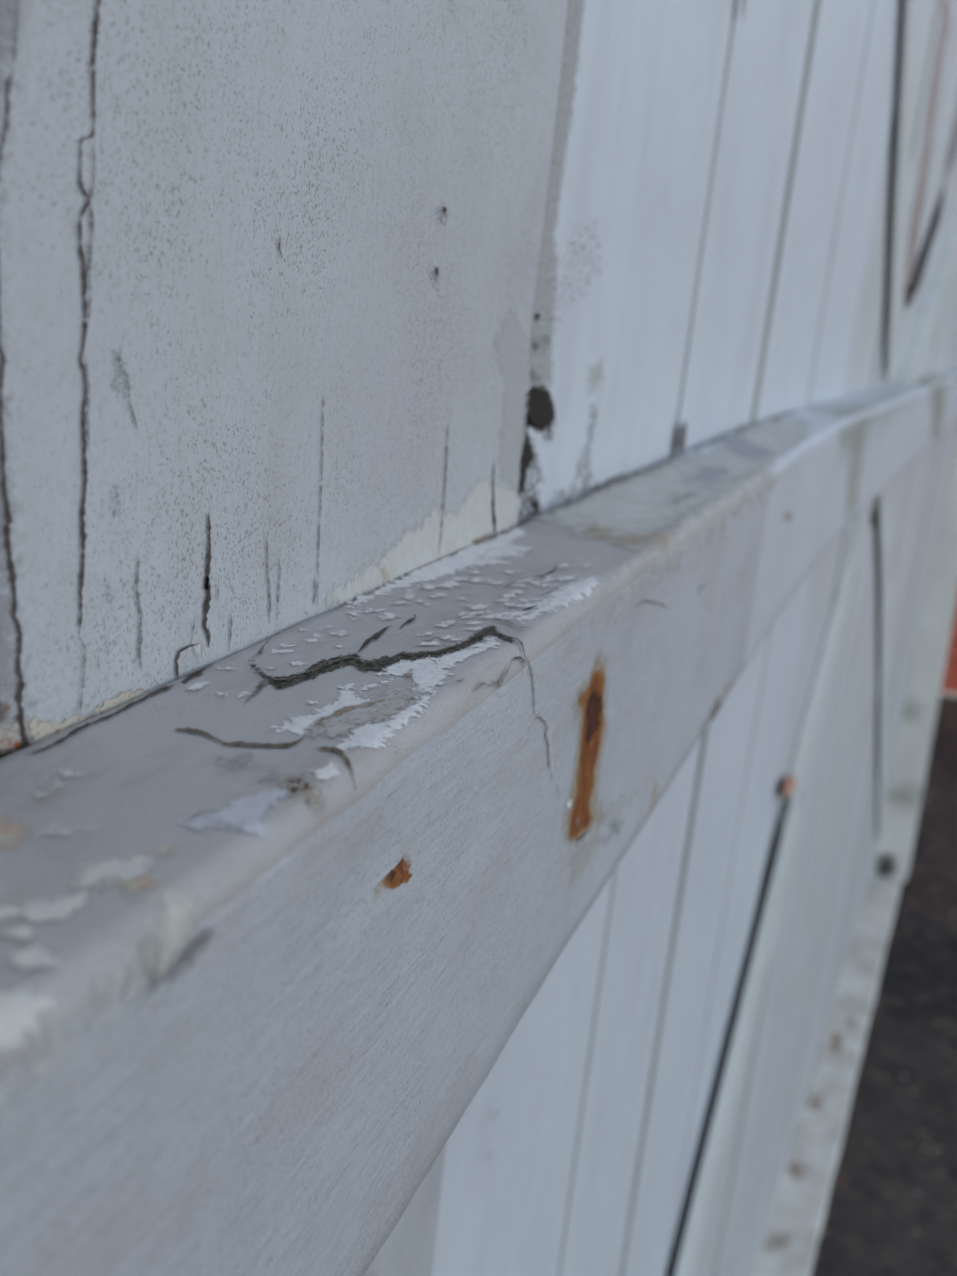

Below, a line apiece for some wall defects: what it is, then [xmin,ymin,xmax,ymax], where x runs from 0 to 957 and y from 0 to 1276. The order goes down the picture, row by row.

crack [0,0,19,159]
crack [0,306,30,748]
crack [78,0,101,711]
crack [314,398,324,606]
crack [439,429,449,555]
crack [490,464,498,537]
peeling [180,0,812,836]
peeling [0,689,149,759]
crack [136,514,556,788]
corrosion [565,670,605,841]
corrosion [382,840,413,889]
peeling [0,855,157,1102]